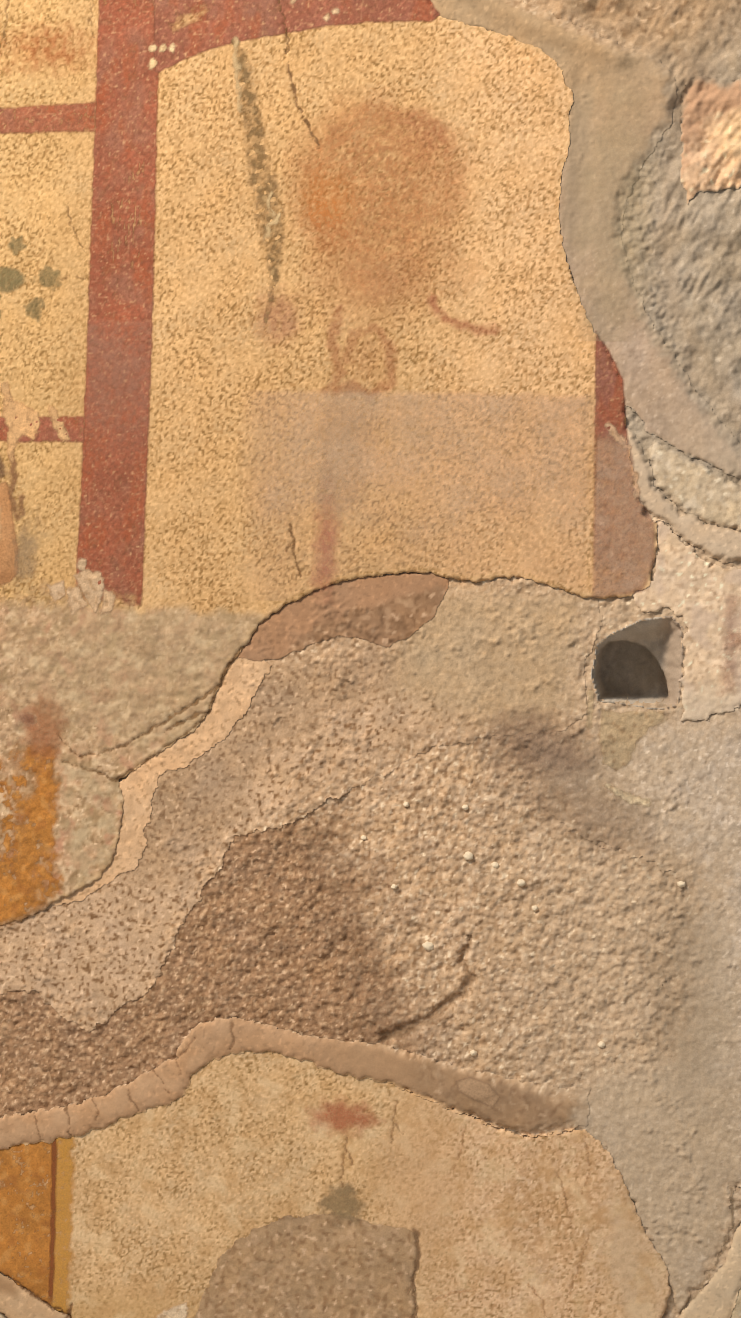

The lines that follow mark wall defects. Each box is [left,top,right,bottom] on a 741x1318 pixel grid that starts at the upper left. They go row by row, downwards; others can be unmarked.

crack [278,0,319,149]
peeling [48,558,115,614]
crack [62,647,244,781]
spalling [51,646,271,906]
spalling [591,616,684,709]
spalling [0,820,409,1118]